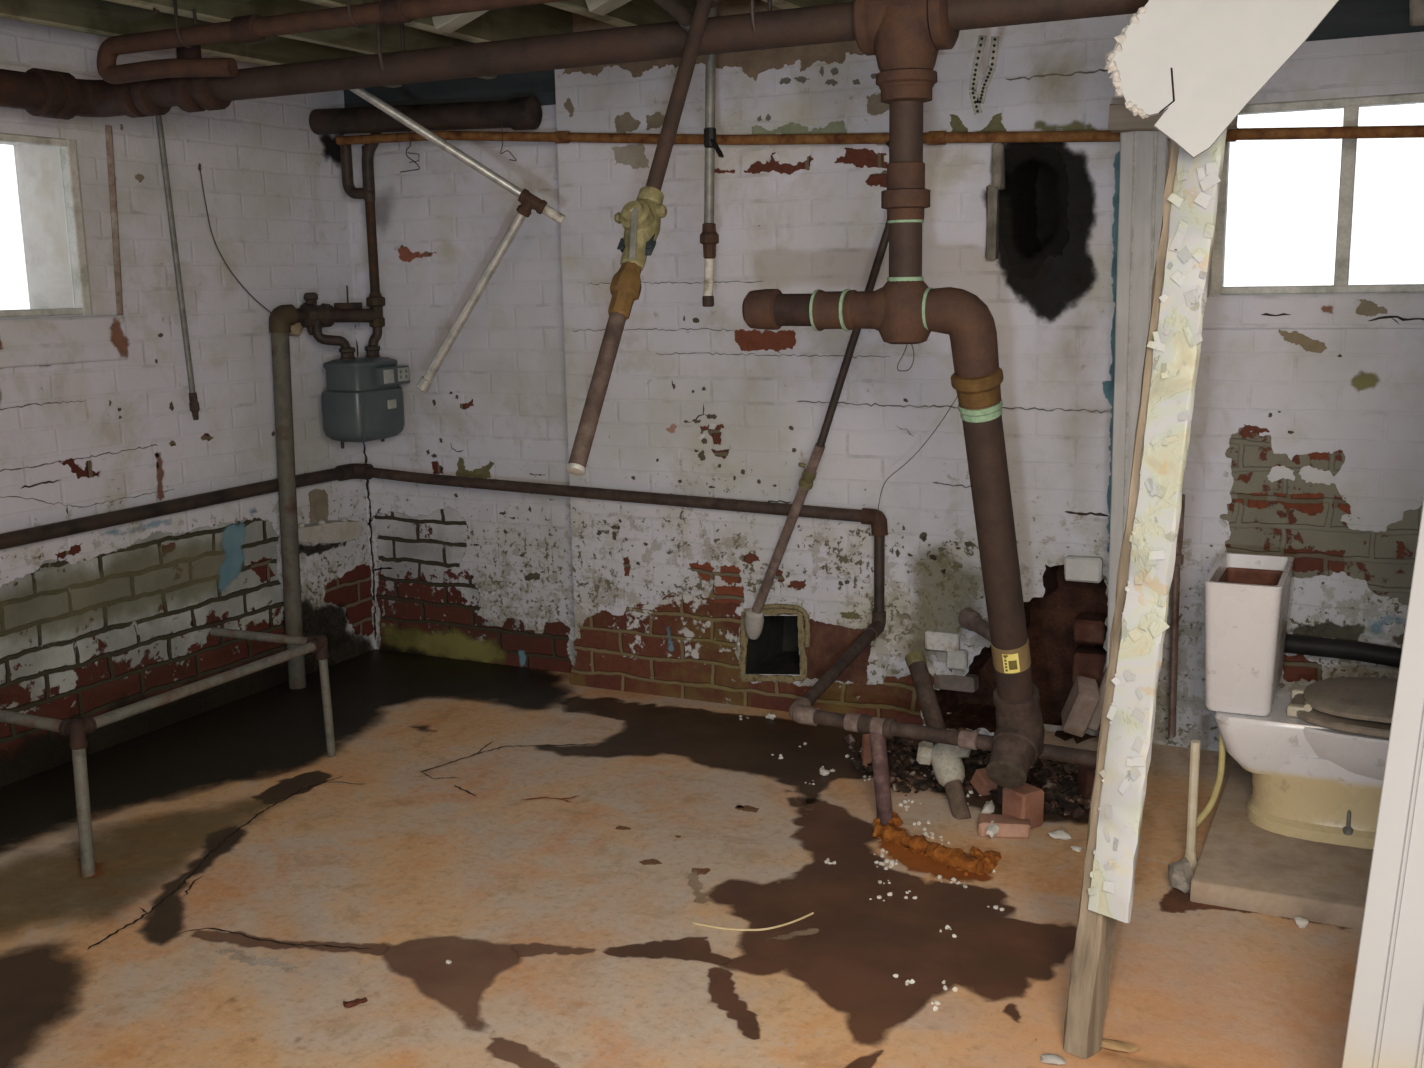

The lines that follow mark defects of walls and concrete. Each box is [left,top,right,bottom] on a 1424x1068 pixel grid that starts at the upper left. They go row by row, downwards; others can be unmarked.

peeling [563,41,889,117]
peeling [950,113,1007,132]
peeling [1147,152,1221,379]
peeling [0,518,287,757]
peeling [426,438,494,479]
water stain [0,600,1077,1068]
peeling [324,493,924,725]
water stain [918,554,977,649]
spalling [928,644,997,733]
water stain [1027,759,1090,824]
spalling [1024,565,1146,895]
peeling [1218,411,1424,605]